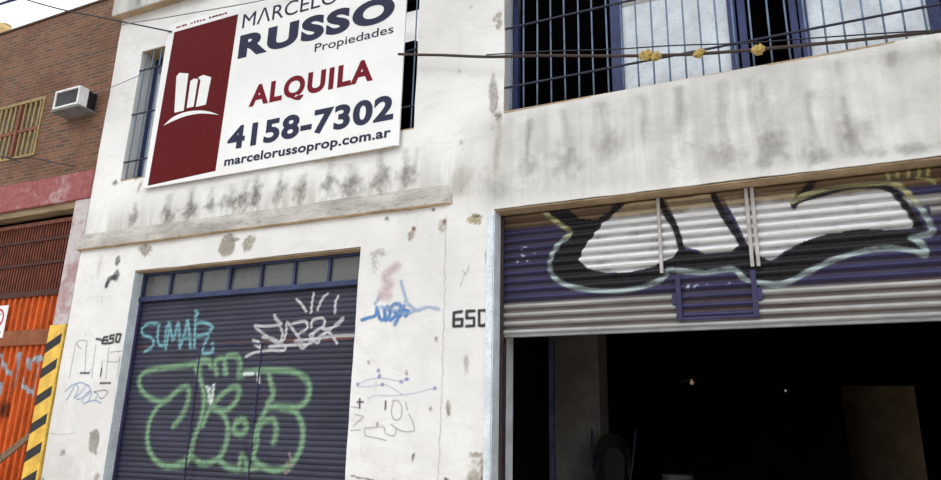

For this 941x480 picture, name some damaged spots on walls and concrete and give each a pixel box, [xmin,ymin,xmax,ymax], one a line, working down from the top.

spalling [219,234,255,256]